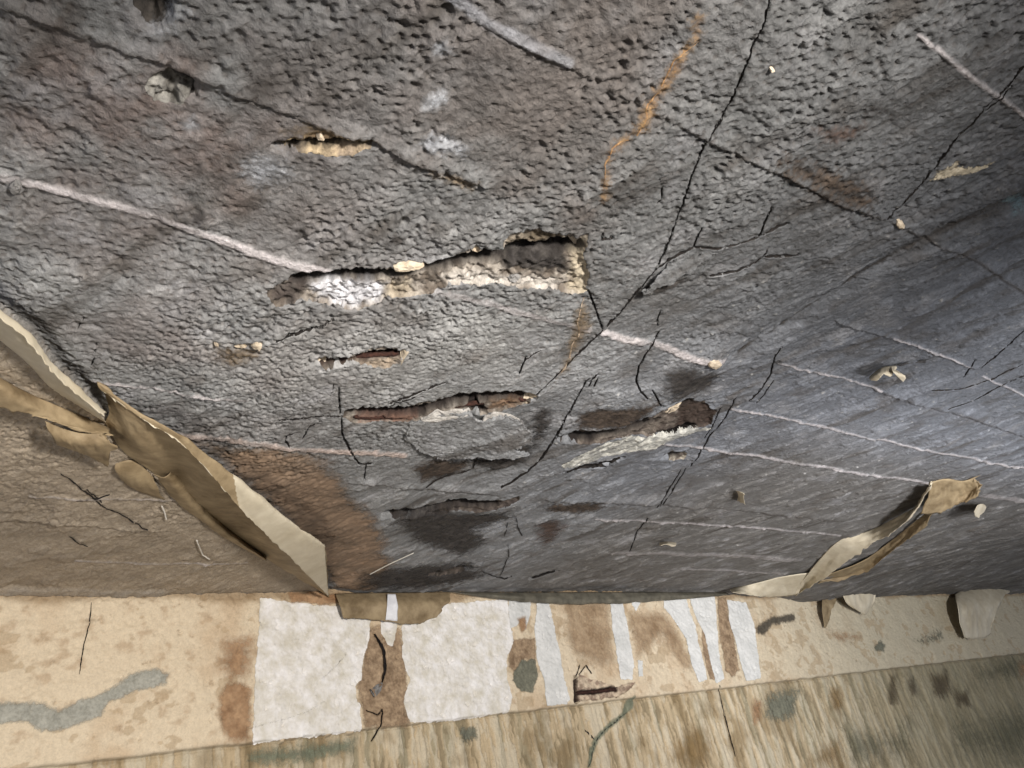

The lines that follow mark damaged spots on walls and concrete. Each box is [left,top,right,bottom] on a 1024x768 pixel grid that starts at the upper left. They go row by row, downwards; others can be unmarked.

corrosion [603,41,699,194]
crack [887,66,1024,220]
spalling [267,228,590,311]
crack [501,0,799,489]
crack [61,474,148,531]
peeling [0,310,329,597]
crack [279,384,372,479]
leakage [358,503,513,589]
spalling [342,391,537,424]
spalling [560,398,717,468]
crack [630,214,979,551]
peeling [702,475,986,680]